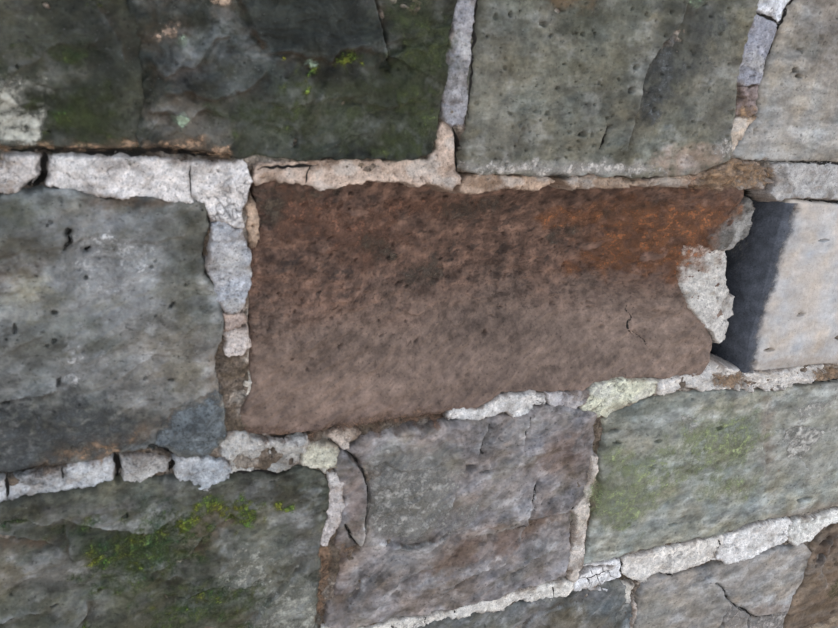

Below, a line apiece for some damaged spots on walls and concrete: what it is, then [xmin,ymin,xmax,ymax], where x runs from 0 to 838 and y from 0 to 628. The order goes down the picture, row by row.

spalling [243,181,743,474]
spalling [784,400,833,458]
crack [715,583,781,626]